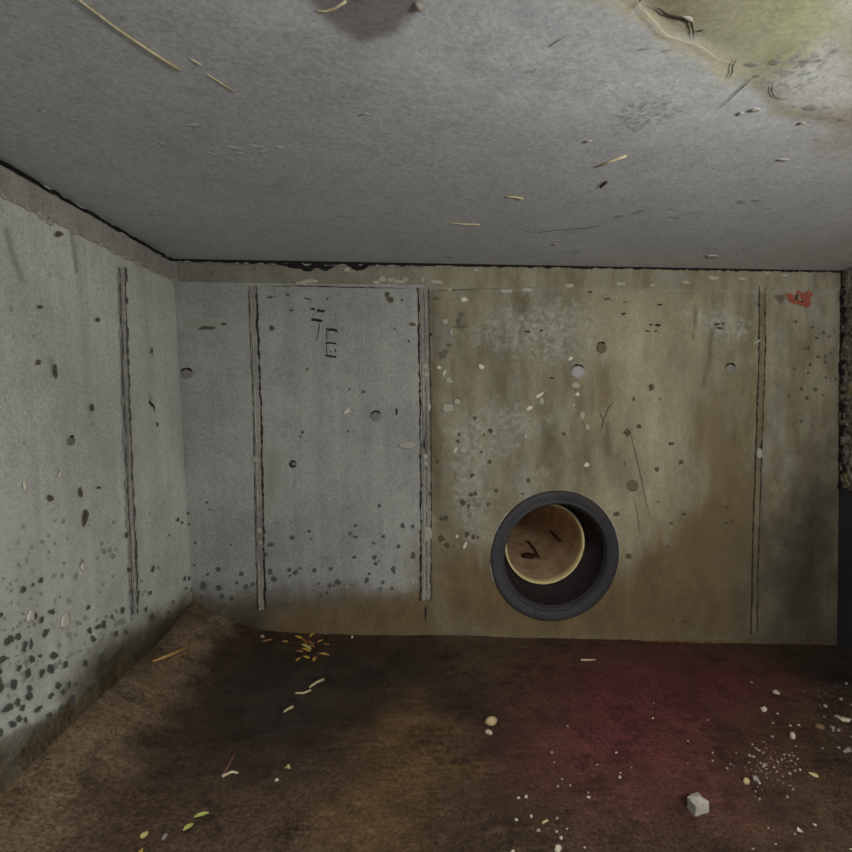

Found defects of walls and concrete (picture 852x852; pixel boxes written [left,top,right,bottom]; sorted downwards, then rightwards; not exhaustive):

leakage [311,0,762,122]
leakage [0,534,267,852]
leakage [450,408,529,540]
leakage [487,289,745,517]
leakage [604,493,641,553]
leakage [751,476,852,703]